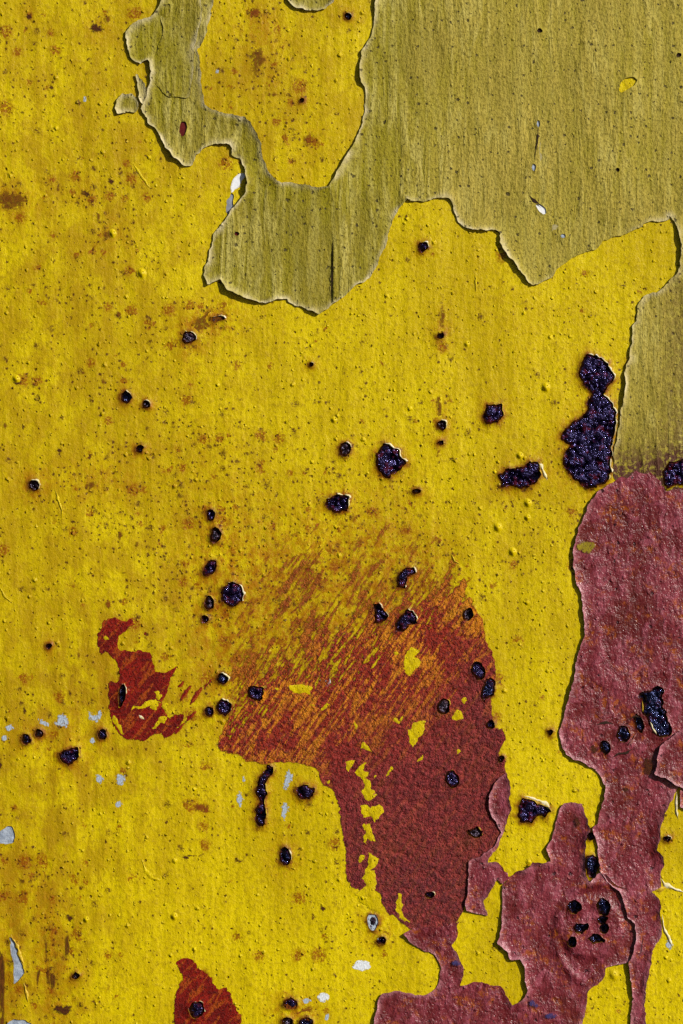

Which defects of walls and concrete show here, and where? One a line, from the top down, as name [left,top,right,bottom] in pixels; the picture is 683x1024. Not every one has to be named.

peeling [121,0,683,491]
peeling [0,826,15,844]
peeling [10,935,29,1001]
peeling [216,471,683,1024]